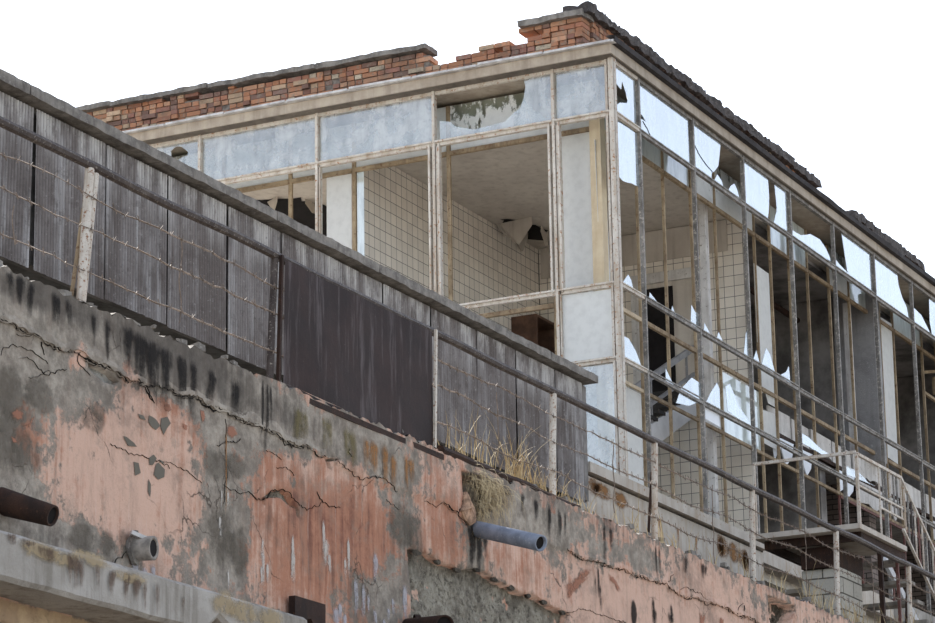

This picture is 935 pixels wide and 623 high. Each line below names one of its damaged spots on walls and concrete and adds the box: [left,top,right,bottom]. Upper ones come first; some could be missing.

leakage [92,316,110,356]
leakage [147,342,197,404]
crack [0,310,399,511]
leakage [207,372,217,398]
leakage [232,384,240,412]
rust [276,255,444,460]
crack [424,500,468,526]
rust [588,479,627,508]
rust [717,535,749,572]
spalling [407,550,565,623]
peeling [567,570,589,597]
crack [566,544,762,623]